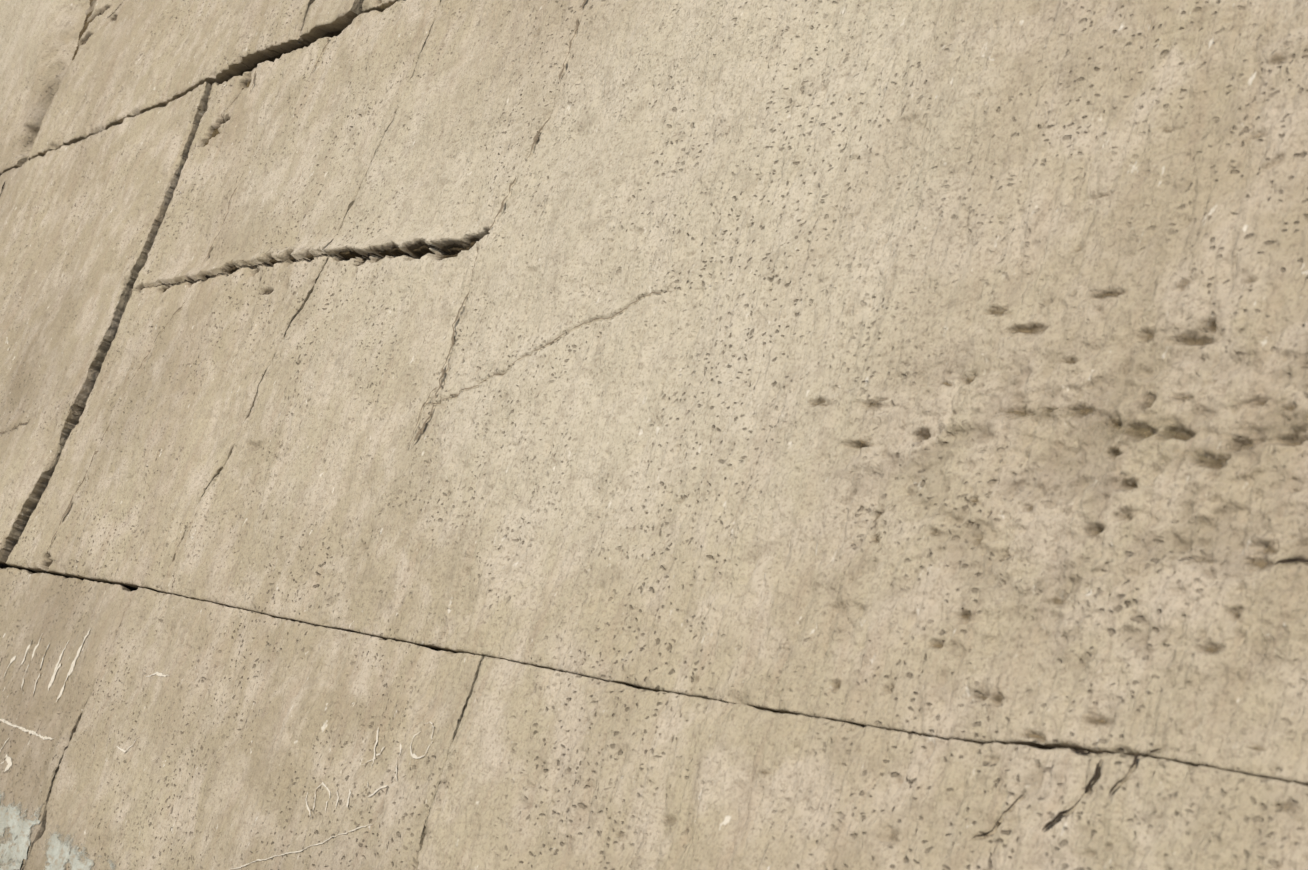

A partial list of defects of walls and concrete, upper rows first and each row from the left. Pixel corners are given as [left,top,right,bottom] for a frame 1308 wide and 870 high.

crack [130,0,660,450]
crack [47,413,115,555]
water stain [0,792,40,870]
water stain [45,832,115,870]